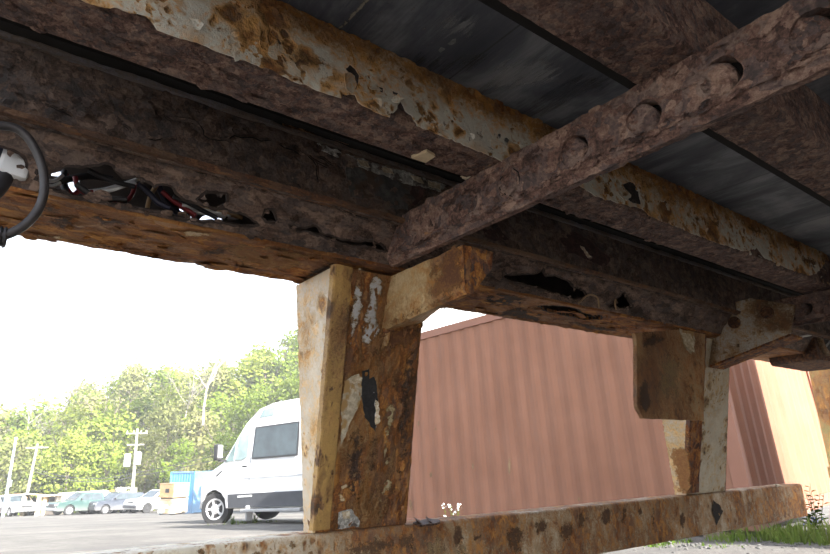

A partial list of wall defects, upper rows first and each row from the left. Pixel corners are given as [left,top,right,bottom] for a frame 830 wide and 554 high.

rust [428,245,464,307]
peeling [350,286,363,348]
peeling [340,374,362,444]
rust [354,308,421,480]
rust [347,436,377,504]
rust [349,499,440,554]
rust [453,526,464,554]
rust [507,527,523,554]
rust [712,500,723,525]